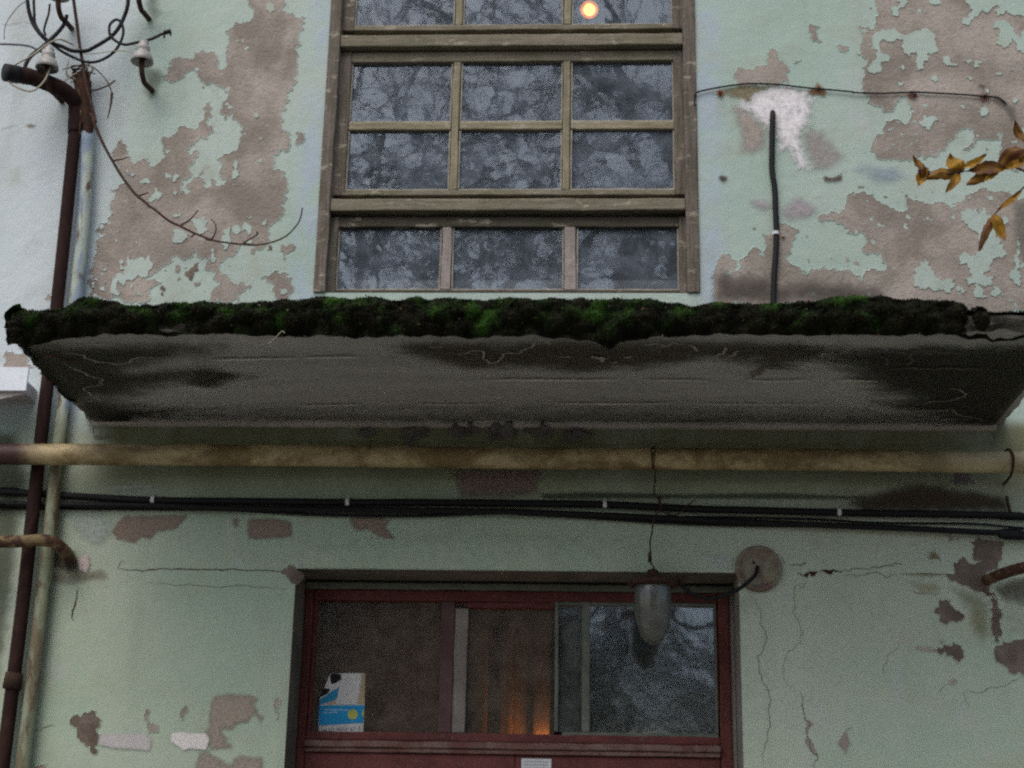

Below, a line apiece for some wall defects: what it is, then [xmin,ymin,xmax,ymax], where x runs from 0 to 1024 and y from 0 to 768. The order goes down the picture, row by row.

peeling [87,0,306,304]
damp [725,86,766,150]
peeling [837,0,1024,167]
peeling [711,186,1024,313]
damp [24,346,357,422]
damp [404,341,1024,425]
crack [118,561,285,589]
peeling [933,598,966,626]
peeling [944,536,1024,676]
crack [756,556,902,768]
peeling [69,709,102,755]
peeling [196,694,263,768]